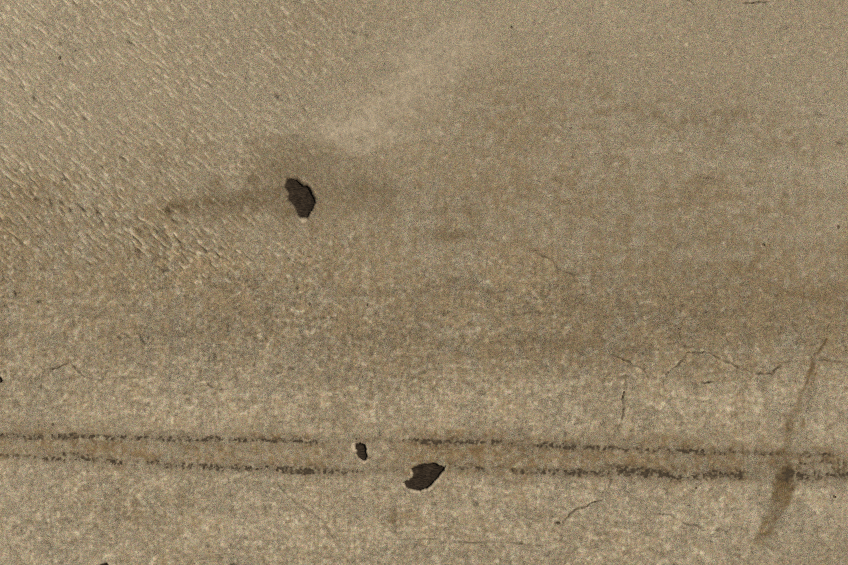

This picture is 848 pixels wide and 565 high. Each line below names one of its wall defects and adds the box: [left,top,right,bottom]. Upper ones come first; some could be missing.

crack [742,0,770,8]
crack [608,329,848,439]
damp [0,428,408,483]
damp [750,335,848,549]
crack [504,478,613,525]
crack [387,537,554,565]